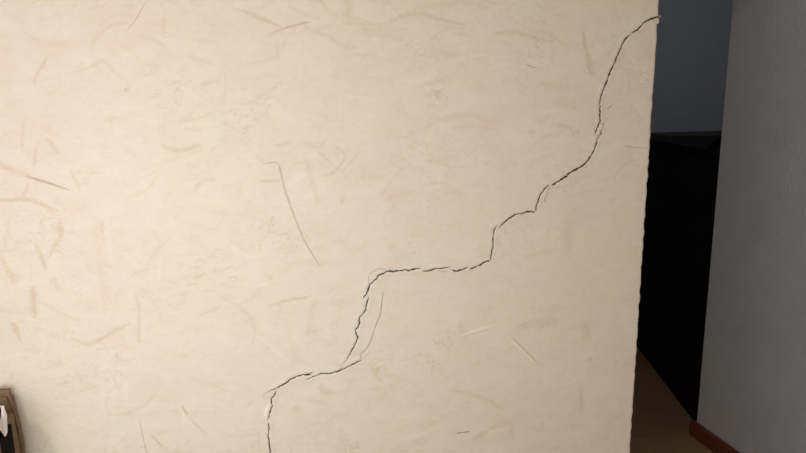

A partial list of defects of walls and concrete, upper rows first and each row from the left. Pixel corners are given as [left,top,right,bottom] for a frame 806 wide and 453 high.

crack [263,16,661,453]